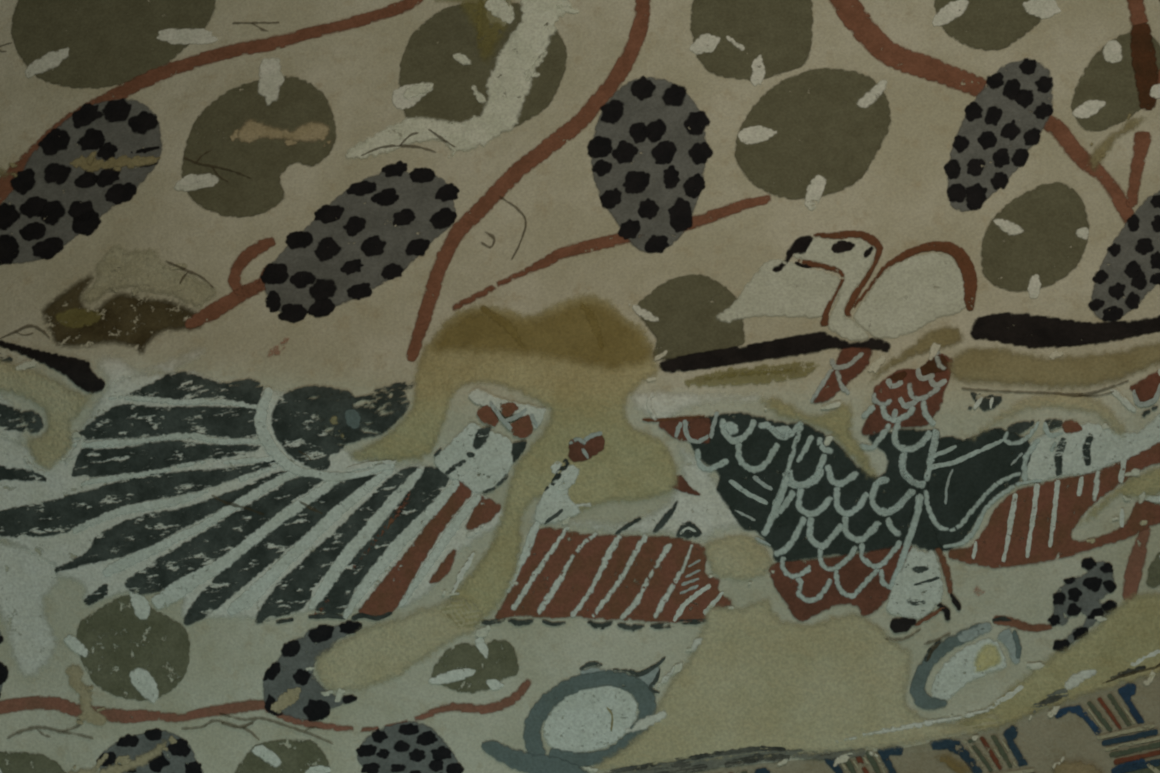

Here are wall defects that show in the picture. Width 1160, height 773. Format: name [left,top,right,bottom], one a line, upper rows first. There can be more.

peeling [346,0,572,159]